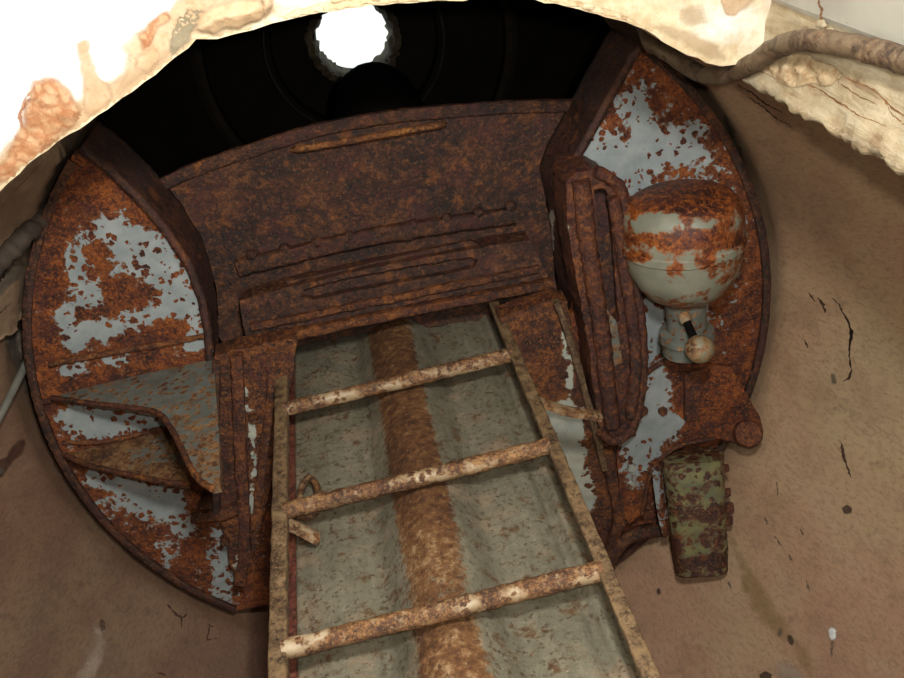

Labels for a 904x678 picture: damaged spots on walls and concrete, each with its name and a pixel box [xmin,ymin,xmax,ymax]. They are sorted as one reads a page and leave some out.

spalling [171,10,204,53]
flaking render [758,54,904,172]
flaking render [0,116,97,246]
flaking render [0,241,33,393]
crack [809,293,854,381]
crack [840,443,851,477]